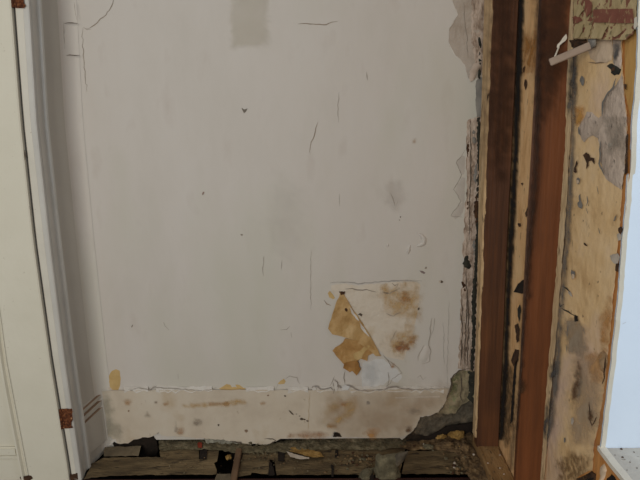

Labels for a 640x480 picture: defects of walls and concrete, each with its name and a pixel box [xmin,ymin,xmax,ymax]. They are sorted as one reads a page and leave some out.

crack [82,0,114,90]
peeling [448,0,484,81]
leakage [562,57,583,274]
flaking render [569,39,627,190]
peeling [316,117,481,441]
peeling [108,369,148,393]
peeling [156,376,308,397]
leakage [543,283,600,440]